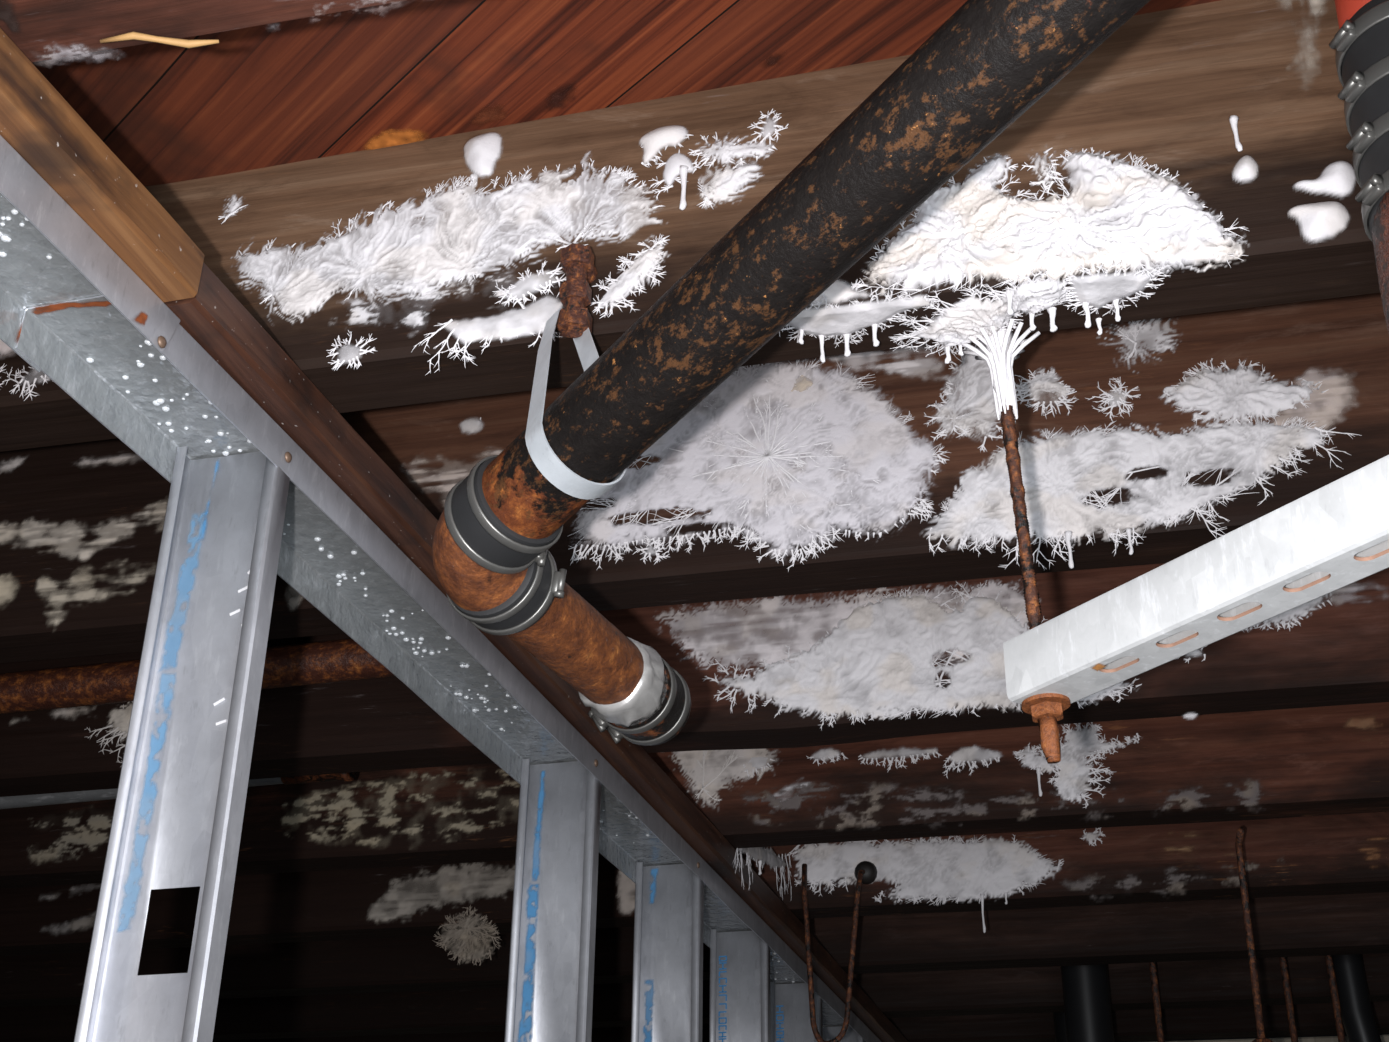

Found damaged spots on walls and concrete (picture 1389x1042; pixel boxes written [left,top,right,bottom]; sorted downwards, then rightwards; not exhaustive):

water stain [0,340,12,354]
water stain [1273,370,1352,429]
water stain [0,459,24,471]
water stain [80,456,131,465]
water stain [0,502,166,625]
water stain [672,749,1036,828]
water stain [1163,790,1209,809]
water stain [1228,781,1260,806]
water stain [369,863,515,922]